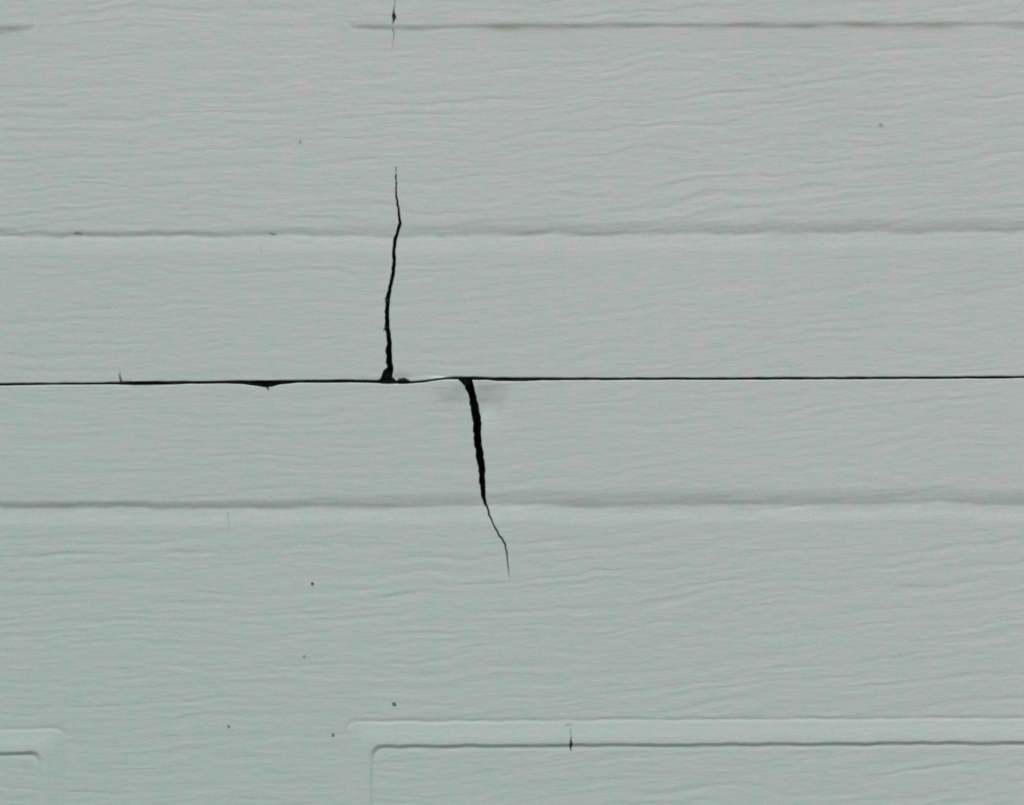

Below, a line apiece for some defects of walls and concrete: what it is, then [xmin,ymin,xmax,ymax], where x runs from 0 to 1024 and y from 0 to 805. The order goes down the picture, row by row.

crack [379,174,409,381]
crack [458,377,509,567]